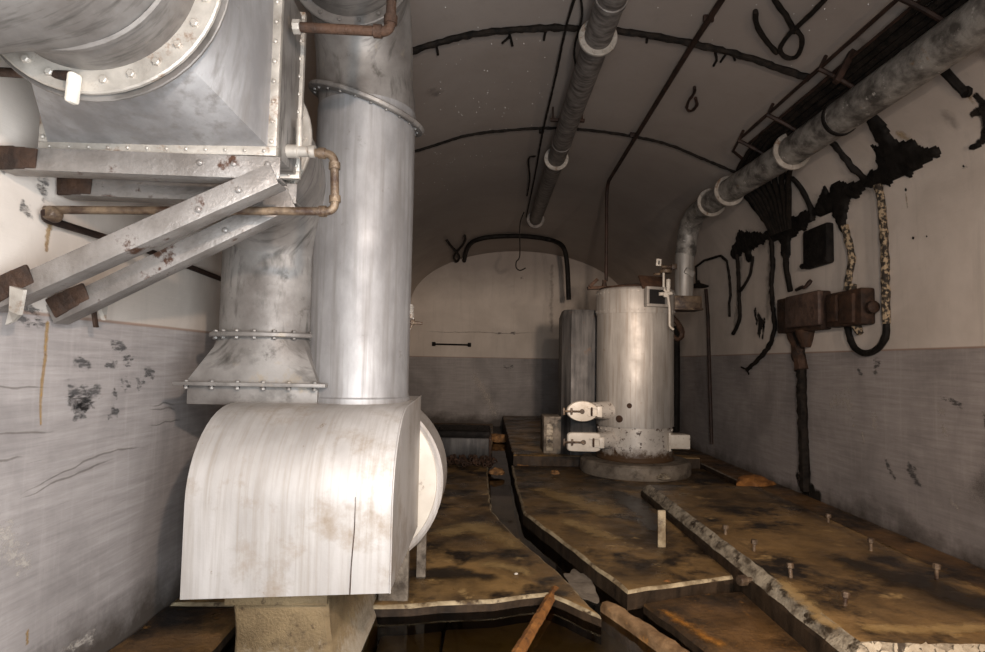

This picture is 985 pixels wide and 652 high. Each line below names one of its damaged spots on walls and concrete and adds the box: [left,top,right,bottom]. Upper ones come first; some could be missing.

corrosion [40,322,49,425]
peeling [68,385,100,419]
peeling [860,641,985,652]